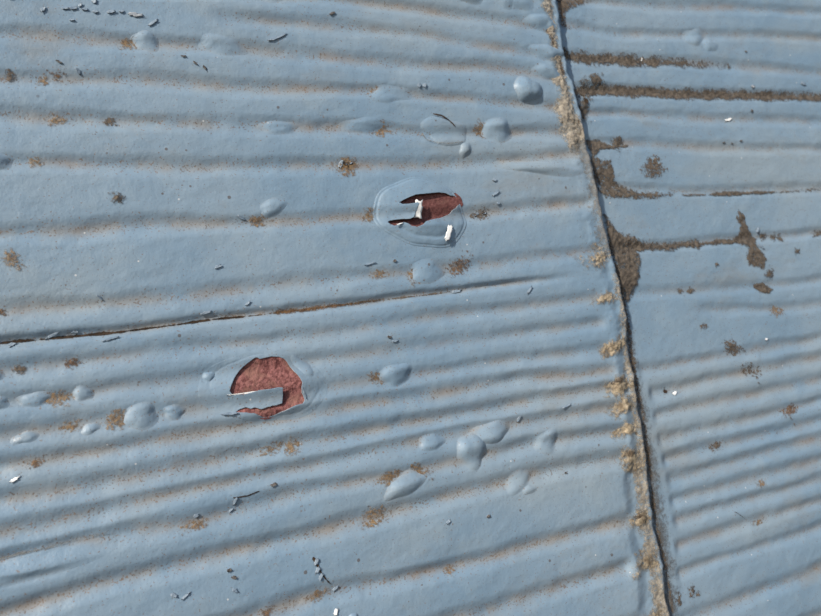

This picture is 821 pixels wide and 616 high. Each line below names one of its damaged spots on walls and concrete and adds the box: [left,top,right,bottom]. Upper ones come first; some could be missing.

peeling [373,177,467,248]
peeling [198,349,328,421]